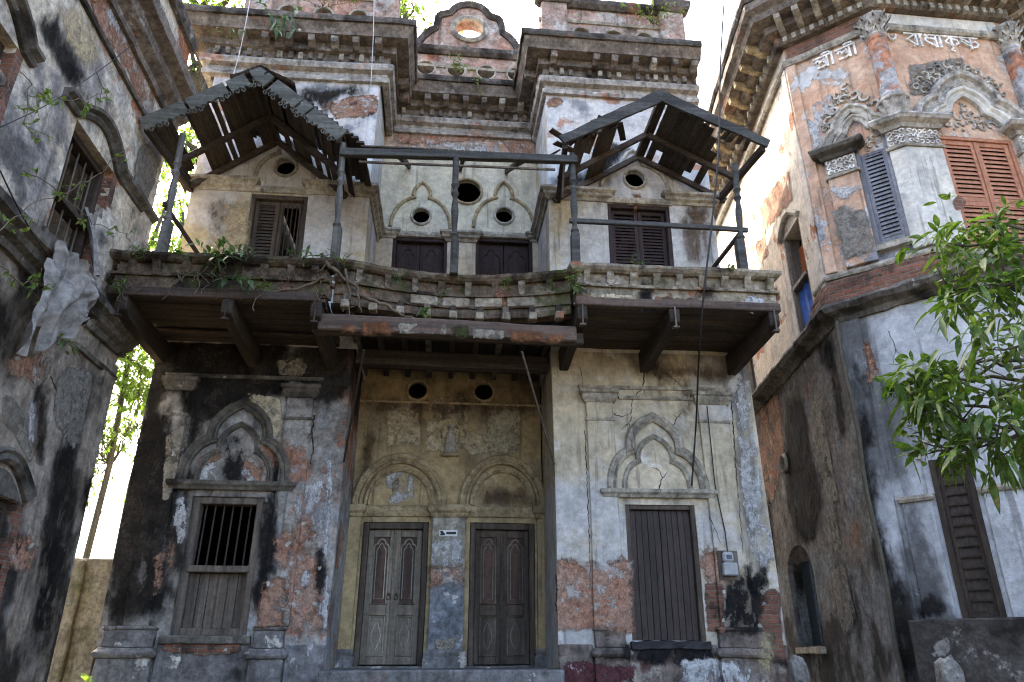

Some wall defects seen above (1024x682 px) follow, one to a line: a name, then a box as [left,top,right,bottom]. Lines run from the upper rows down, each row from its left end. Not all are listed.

damp [40,8,98,89]
peeling [327,94,378,119]
damp [31,446,94,634]
damp [109,385,187,620]
peeling [254,521,342,669]
peeling [386,472,414,504]
peeling [557,556,636,634]
crack [613,373,680,429]
flaking render [699,546,787,677]
damp [723,383,777,635]
damp [785,338,845,553]
damp [859,406,946,682]